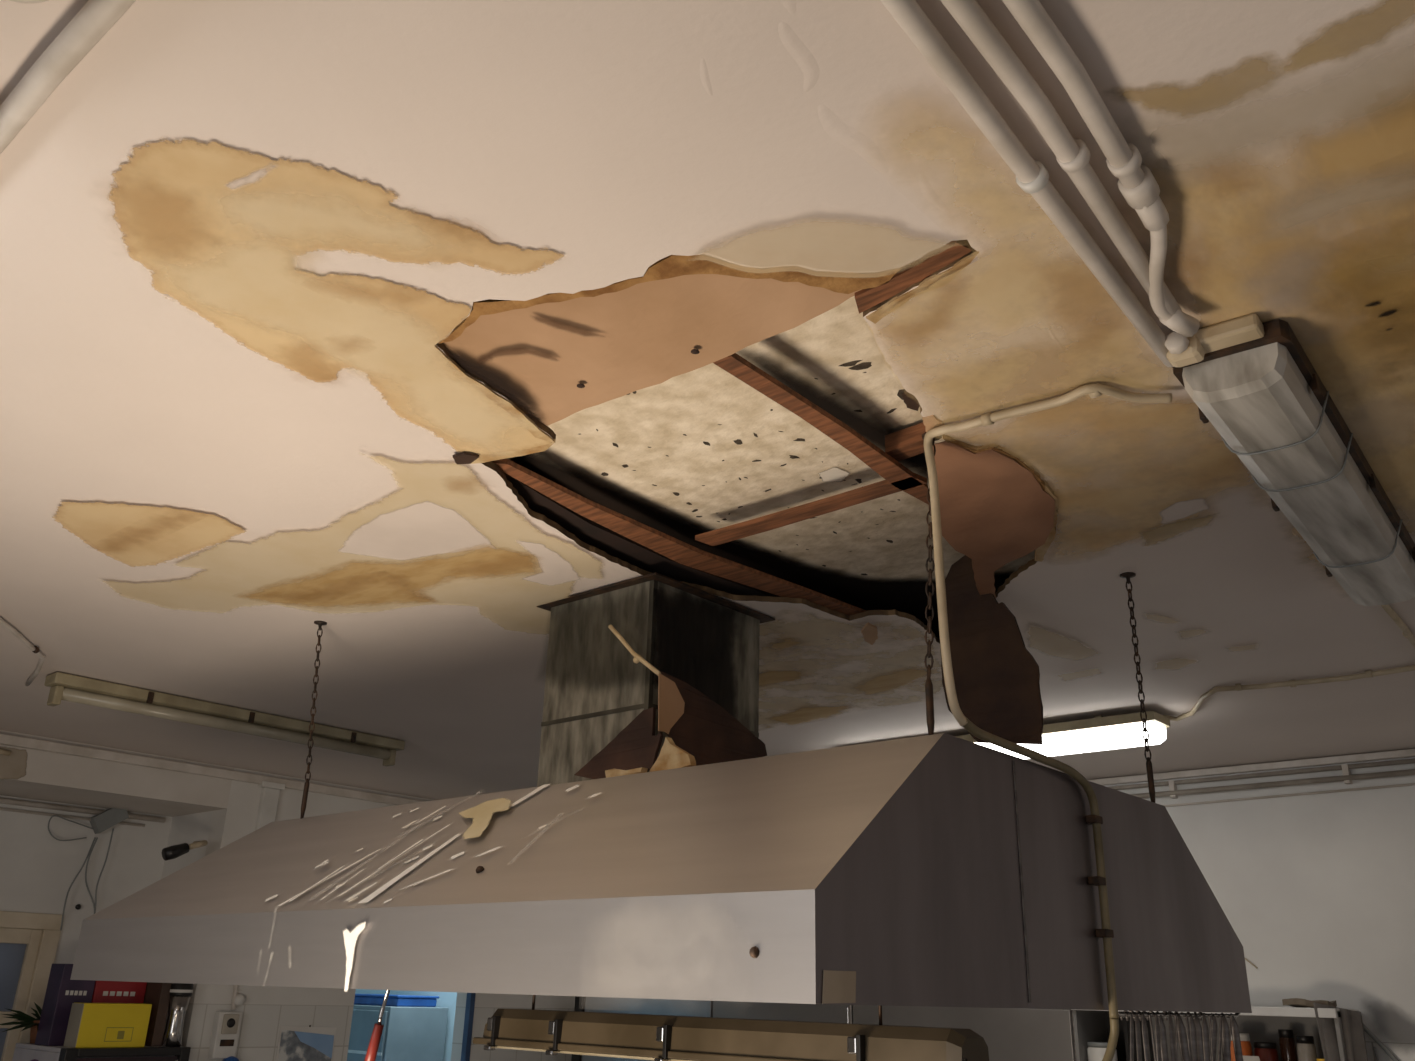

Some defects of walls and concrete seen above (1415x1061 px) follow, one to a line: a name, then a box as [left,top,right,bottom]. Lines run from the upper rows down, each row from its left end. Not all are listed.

water stain [53,140,602,634]
peeling [453,452,479,465]
spalling [506,452,940,645]
spalling [741,353,944,452]
spalling [994,573,1012,593]
water stain [884,131,1245,551]
water stain [1122,0,1415,531]